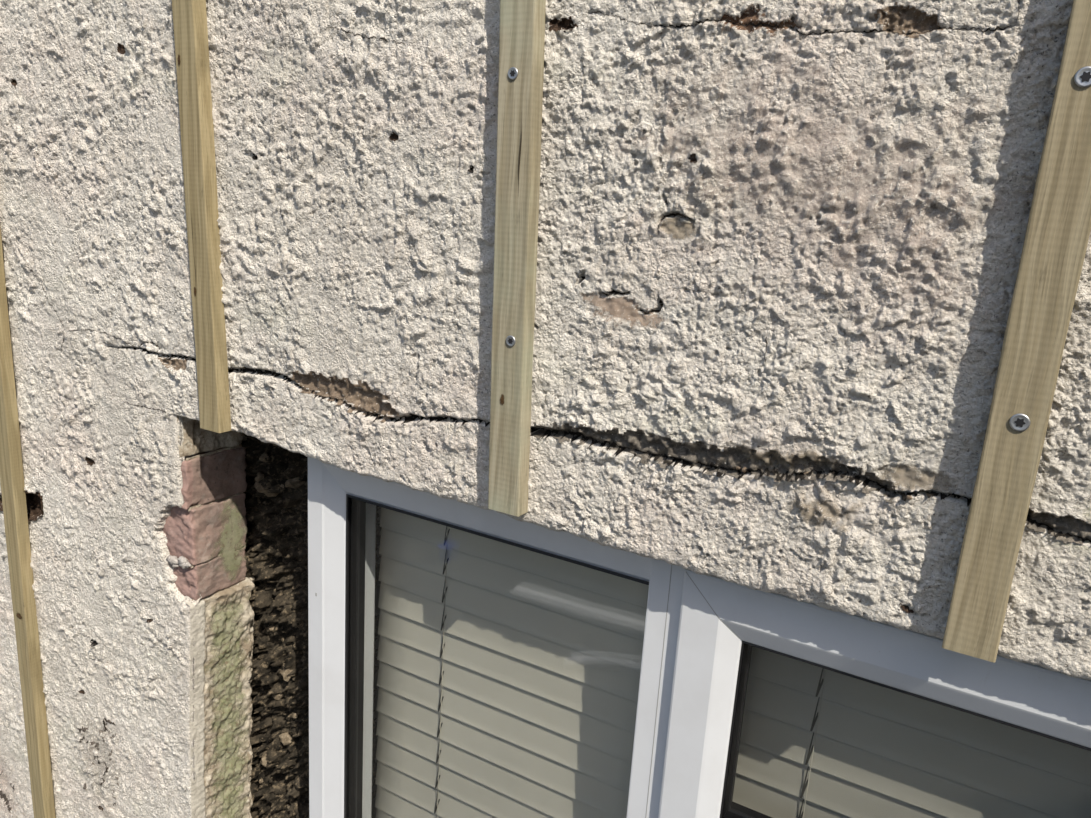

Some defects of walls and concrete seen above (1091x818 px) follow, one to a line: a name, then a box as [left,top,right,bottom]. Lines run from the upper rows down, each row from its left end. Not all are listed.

crack [593,0,1020,36]
crack [28,267,196,374]
peeling [579,276,663,328]
crack [228,367,490,427]
crack [531,423,972,507]
crack [1026,508,1091,545]